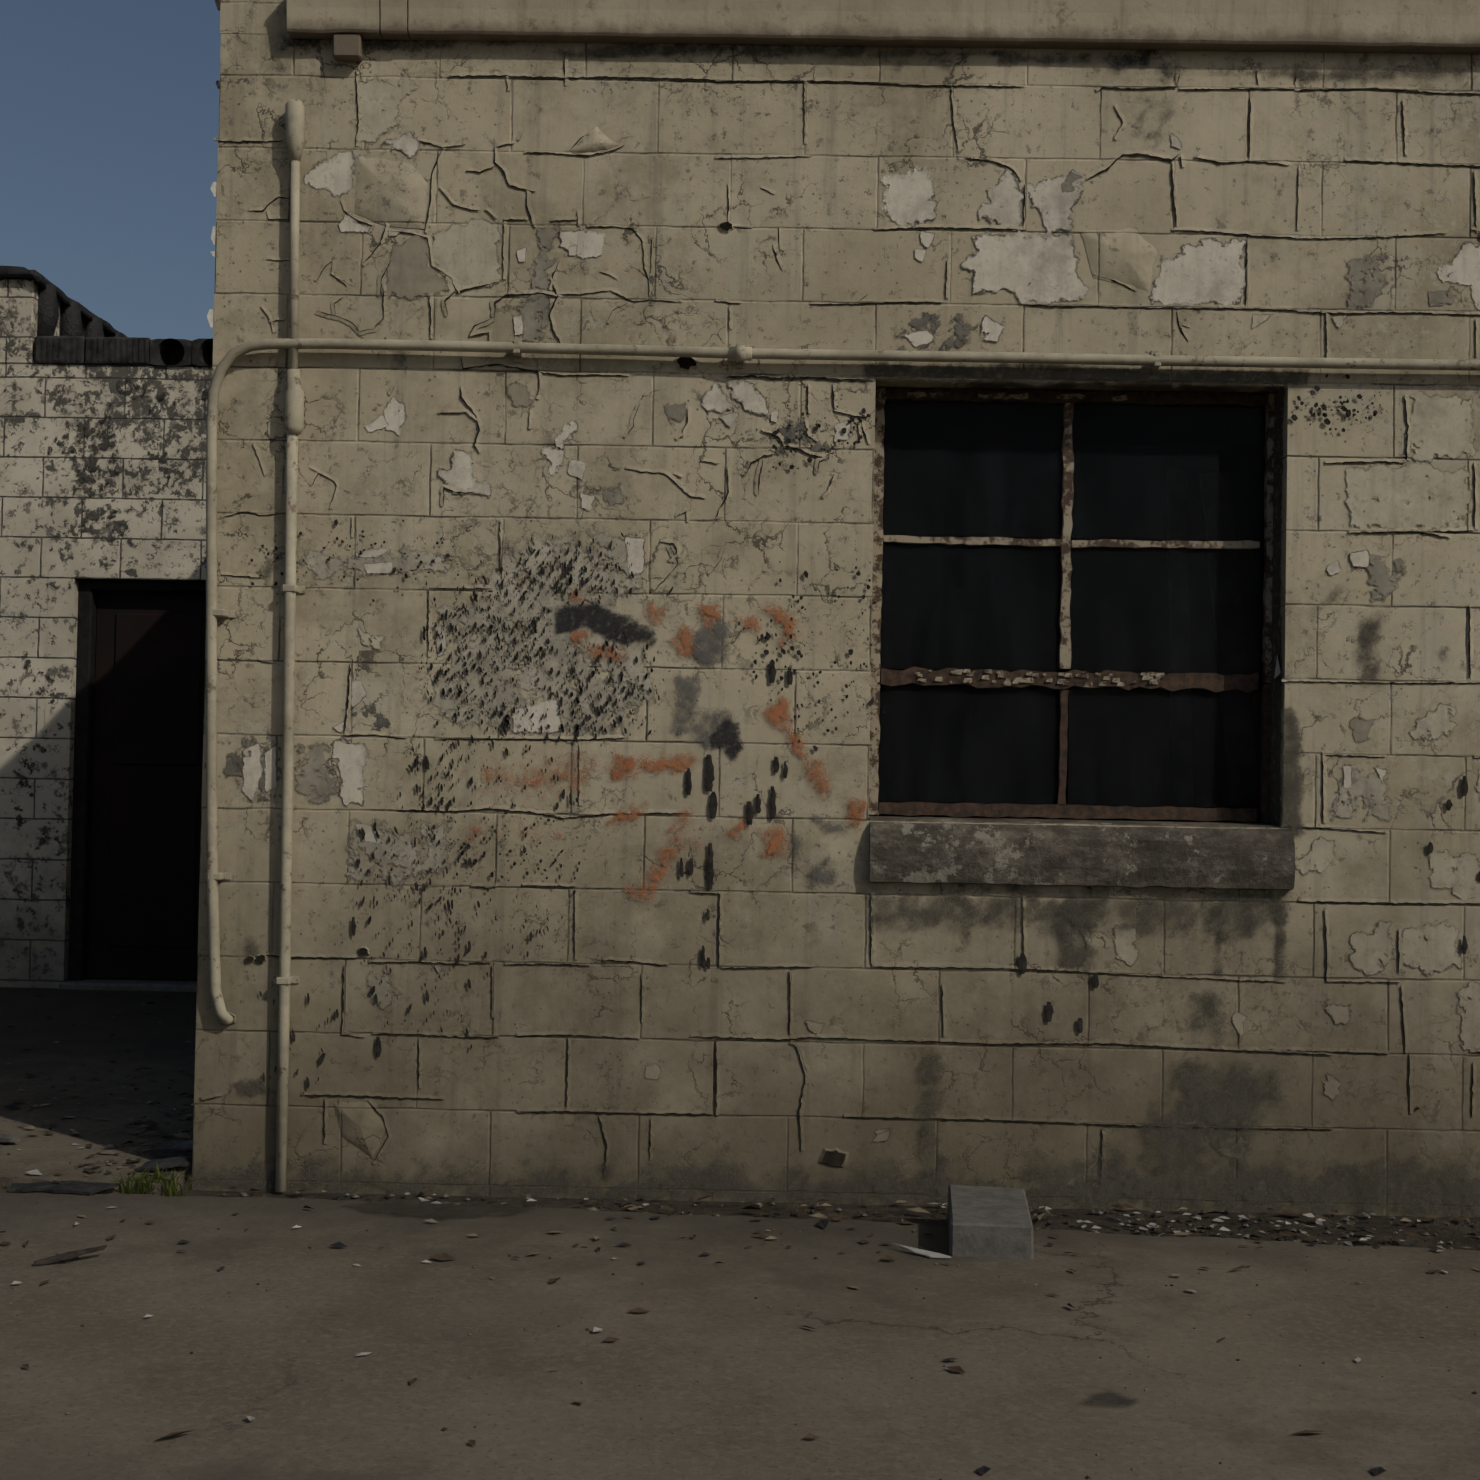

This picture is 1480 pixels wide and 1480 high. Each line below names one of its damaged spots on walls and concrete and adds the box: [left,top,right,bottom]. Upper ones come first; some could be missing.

crack [214,136,283,144]
crack [249,194,290,220]
crack [354,71,362,146]
peeling [303,75,421,234]
crack [261,124,874,591]
crack [448,54,1029,306]
peeling [895,311,1005,351]
peeling [961,168,1090,307]
peeling [1148,237,1273,328]
peeling [223,420,673,1050]
leakage [870,885,1287,978]
peeling [1349,920,1480,1051]